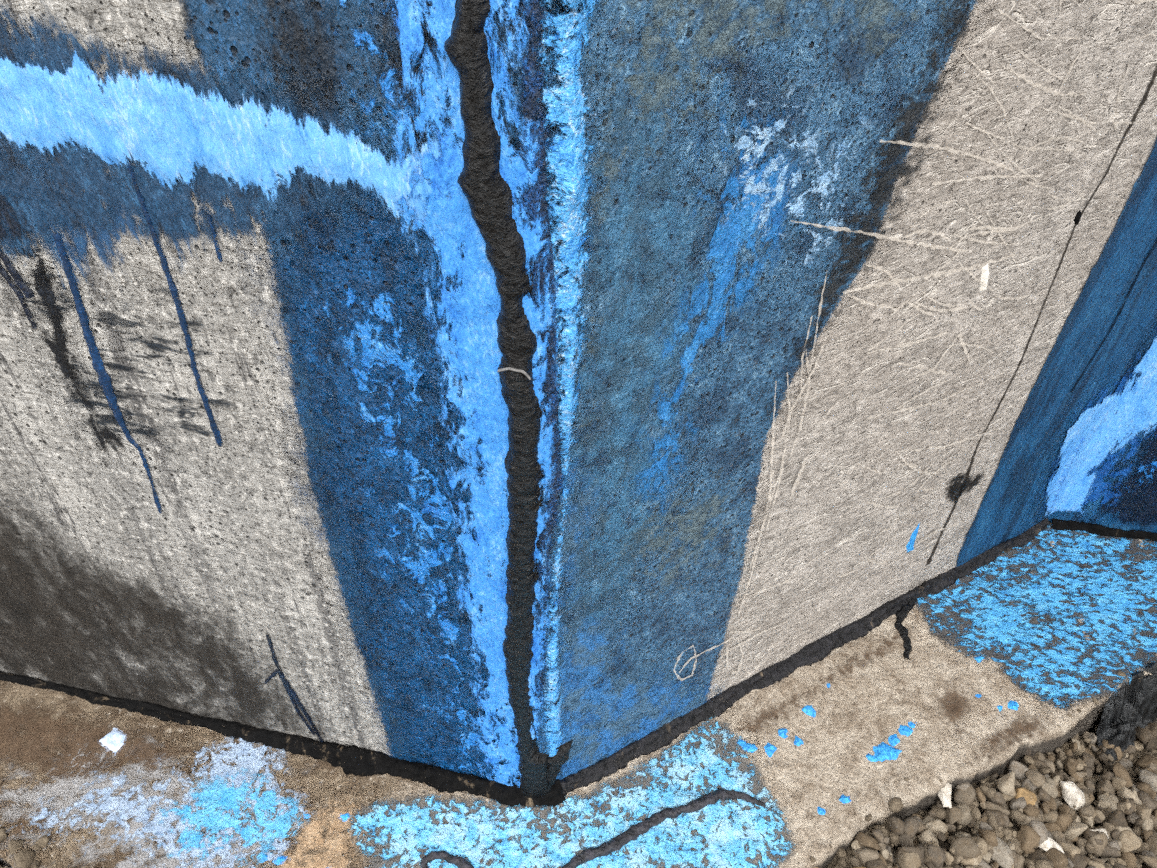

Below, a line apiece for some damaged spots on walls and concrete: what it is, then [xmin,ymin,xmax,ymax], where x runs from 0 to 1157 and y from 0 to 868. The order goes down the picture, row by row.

crack [925,66,1157,566]
crack [420,851,474,868]
crack [562,788,766,868]